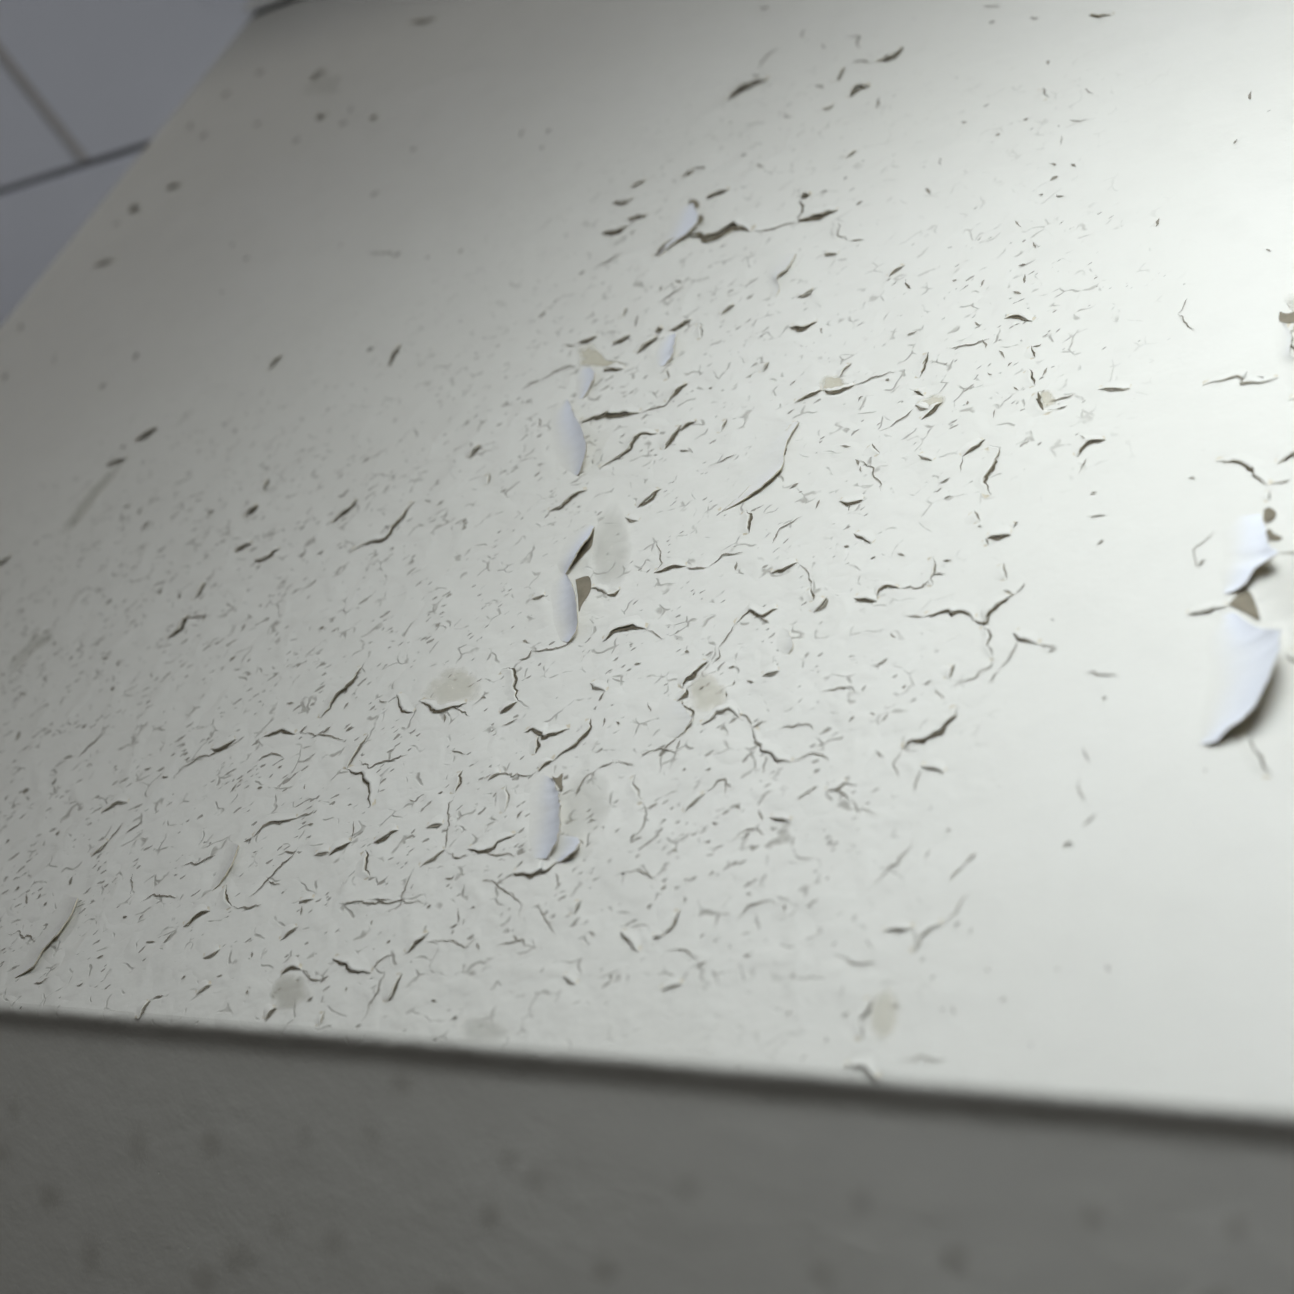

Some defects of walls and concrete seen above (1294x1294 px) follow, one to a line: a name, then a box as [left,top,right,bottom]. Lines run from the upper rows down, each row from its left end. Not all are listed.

peeling [658,203,738,256]
crack [382,344,402,368]
crack [522,286,735,512]
crack [784,308,1132,544]
peeling [1275,321,1294,391]
peeling [551,524,595,643]
peeling [1219,514,1278,595]
peeling [1199,612,1282,744]
crack [130,438,1056,1026]
peeling [528,773,580,862]
crack [844,996,944,1081]